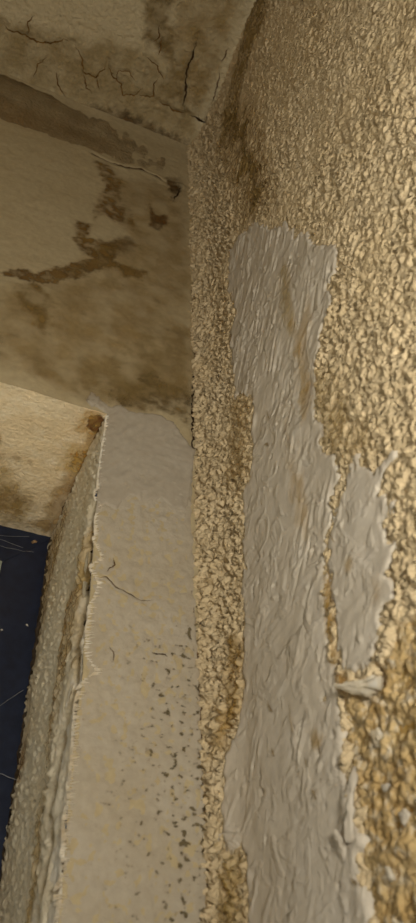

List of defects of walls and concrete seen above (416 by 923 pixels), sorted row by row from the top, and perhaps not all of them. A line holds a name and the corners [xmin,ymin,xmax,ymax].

crack [3,16,228,123]
damp [219,0,266,212]
damp [3,221,147,290]
damp [96,161,134,225]
damp [150,208,167,225]
flaking render [47,415,109,923]
spalling [332,615,416,923]